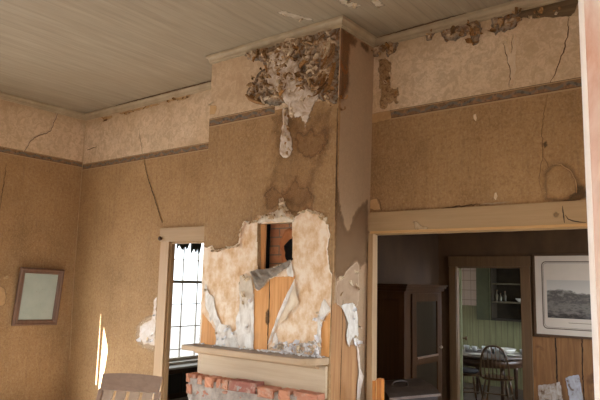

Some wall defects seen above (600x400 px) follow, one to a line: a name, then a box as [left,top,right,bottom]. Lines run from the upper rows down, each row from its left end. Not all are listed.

peeling [245,28,340,155]
crack [539,19,577,193]
crack [24,113,57,150]
crack [139,134,163,223]
spalling [261,224,270,269]
spalling [279,228,293,263]
peeling [336,262,360,312]
flaking render [136,297,157,346]